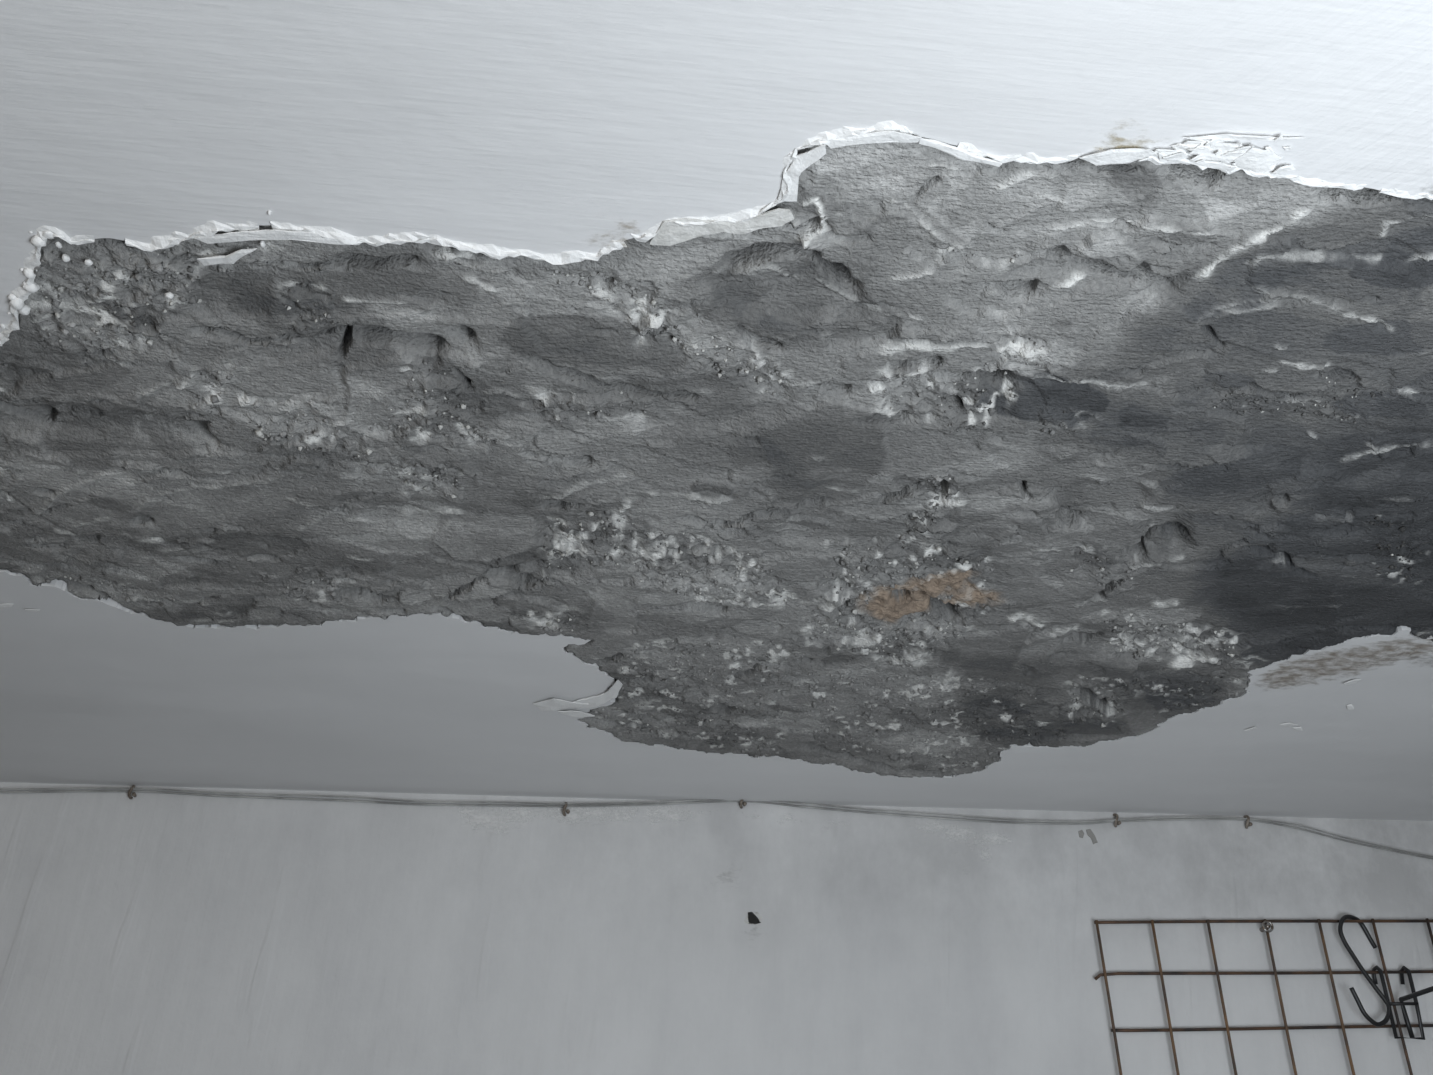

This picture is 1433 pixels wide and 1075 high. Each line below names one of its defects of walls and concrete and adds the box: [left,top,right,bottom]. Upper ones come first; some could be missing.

spalling [0,121,1433,778]